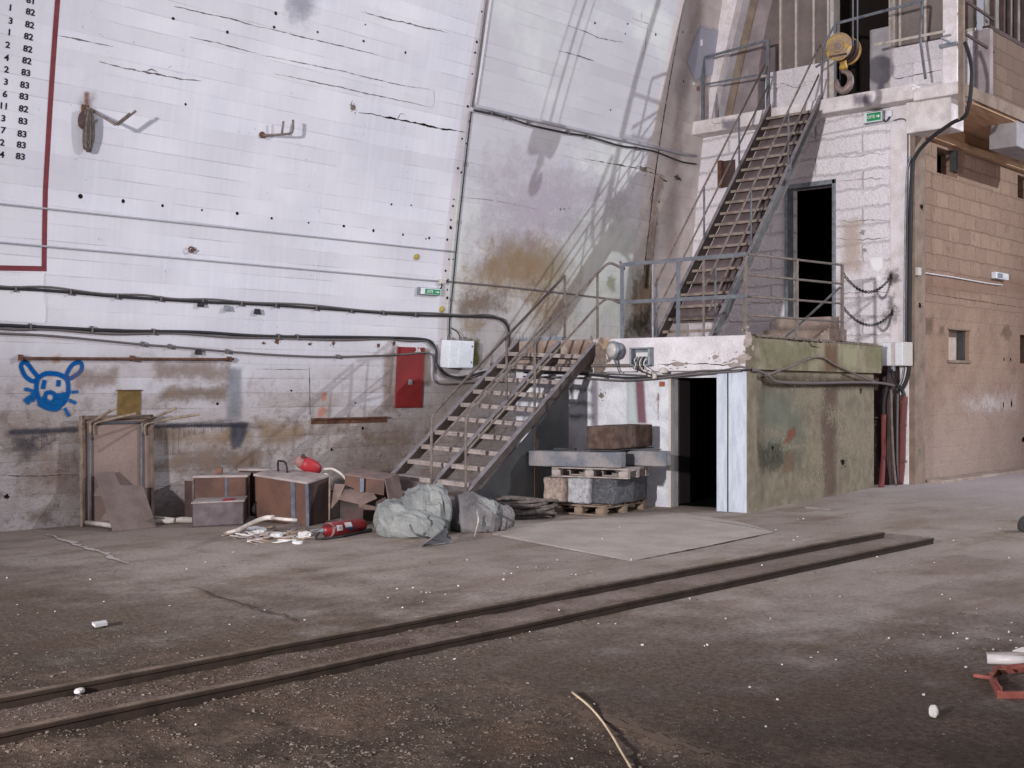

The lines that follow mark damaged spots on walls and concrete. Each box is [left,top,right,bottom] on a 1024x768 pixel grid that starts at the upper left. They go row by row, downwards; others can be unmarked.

crack [62,36,199,81]
crack [174,6,463,132]
damp [625,264,656,338]
damp [759,377,878,495]
crack [46,534,132,565]